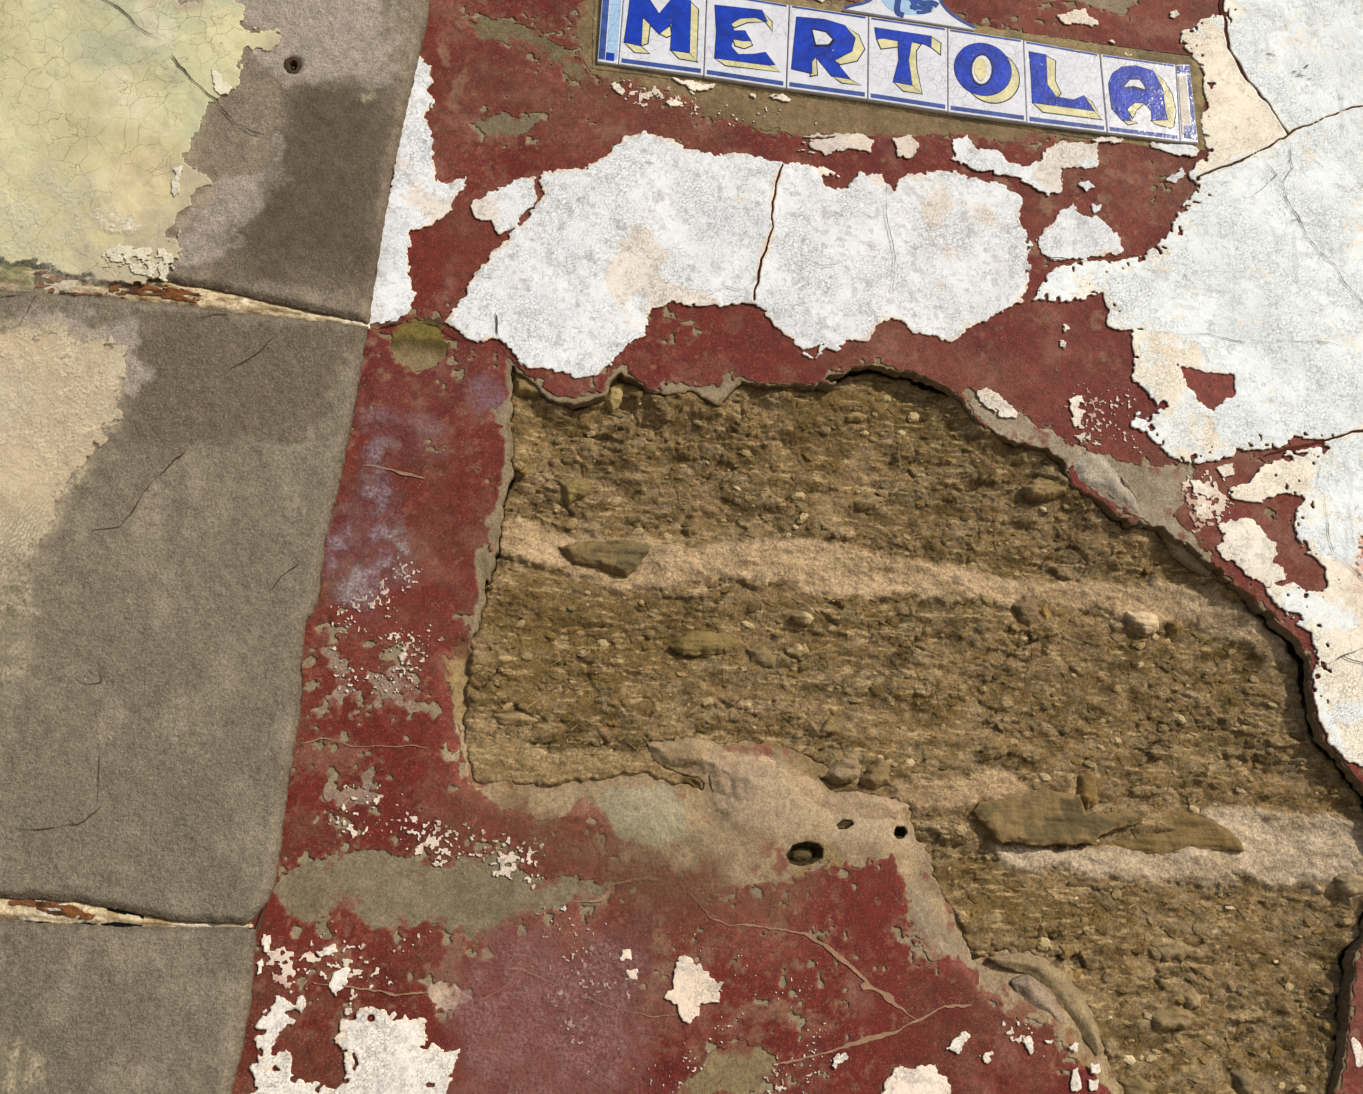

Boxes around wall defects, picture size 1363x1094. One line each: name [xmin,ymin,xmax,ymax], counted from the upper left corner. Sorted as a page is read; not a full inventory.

peeling [0,0,282,285]
crack [726,162,784,302]
crack [1196,0,1363,302]
flaking render [370,0,1363,1094]
crack [1264,429,1363,576]
crack [1317,648,1363,668]
rust [9,899,96,920]
crack [582,875,972,1064]